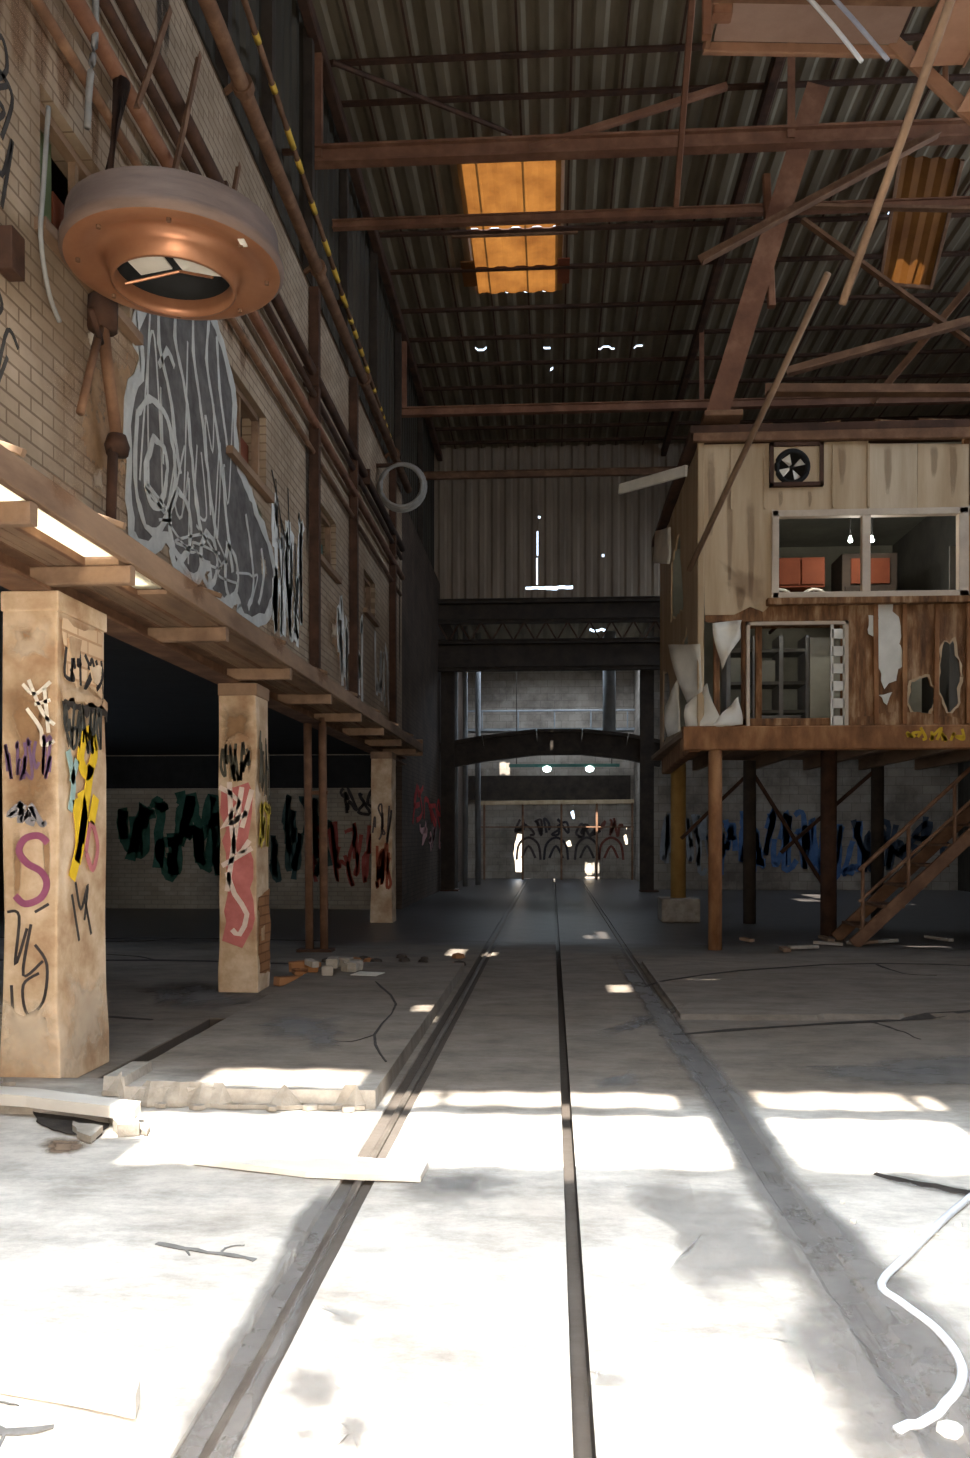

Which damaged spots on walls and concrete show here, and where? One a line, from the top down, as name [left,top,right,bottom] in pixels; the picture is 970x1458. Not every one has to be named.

peeling [868,604,902,705]
crack [633,963,970,989]
crack [659,1010,970,1039]